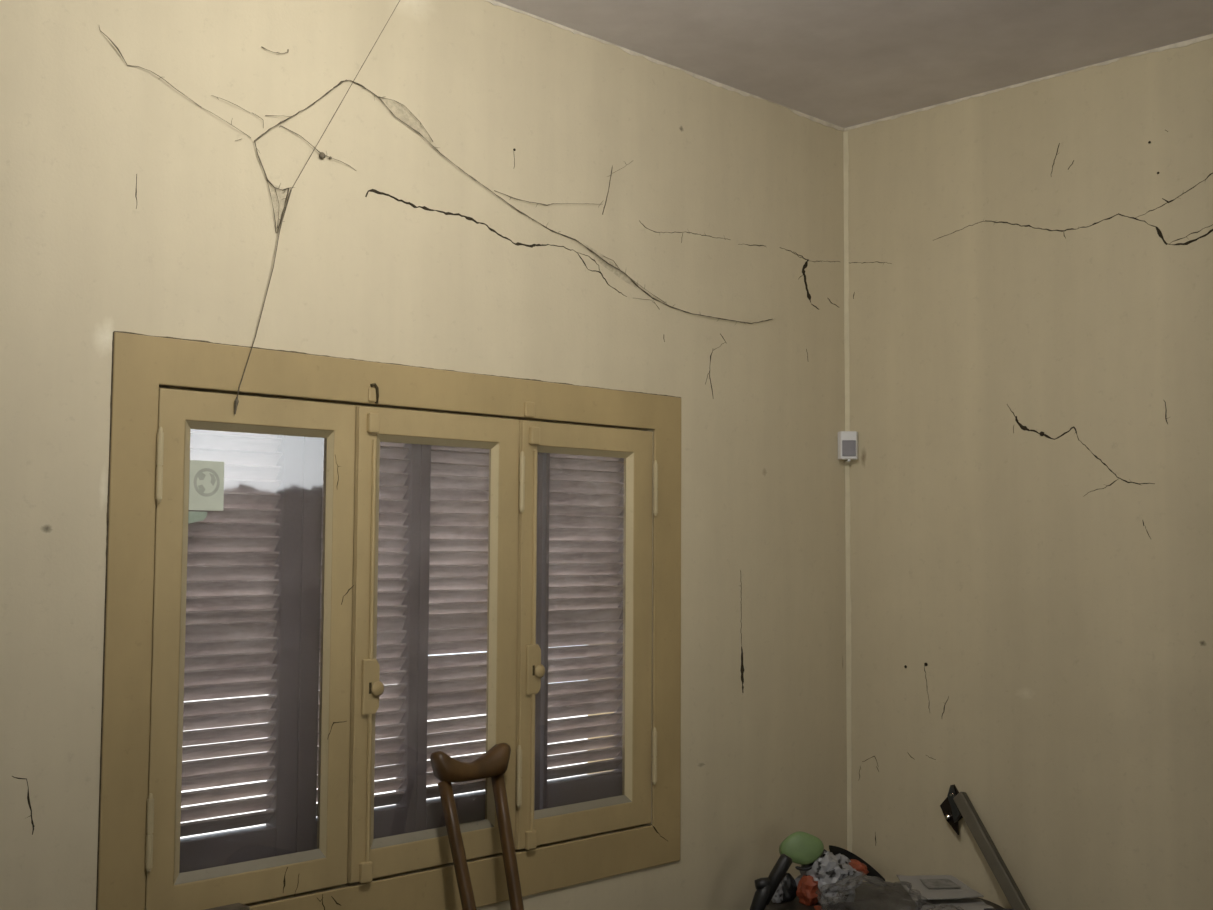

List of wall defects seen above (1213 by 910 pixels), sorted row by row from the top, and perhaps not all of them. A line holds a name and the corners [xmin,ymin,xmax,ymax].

crack [365,189,627,297]
crack [639,220,891,309]
crack [935,172,1213,245]
crack [1007,404,1154,497]
crack [738,571,746,693]
crack [12,776,35,835]